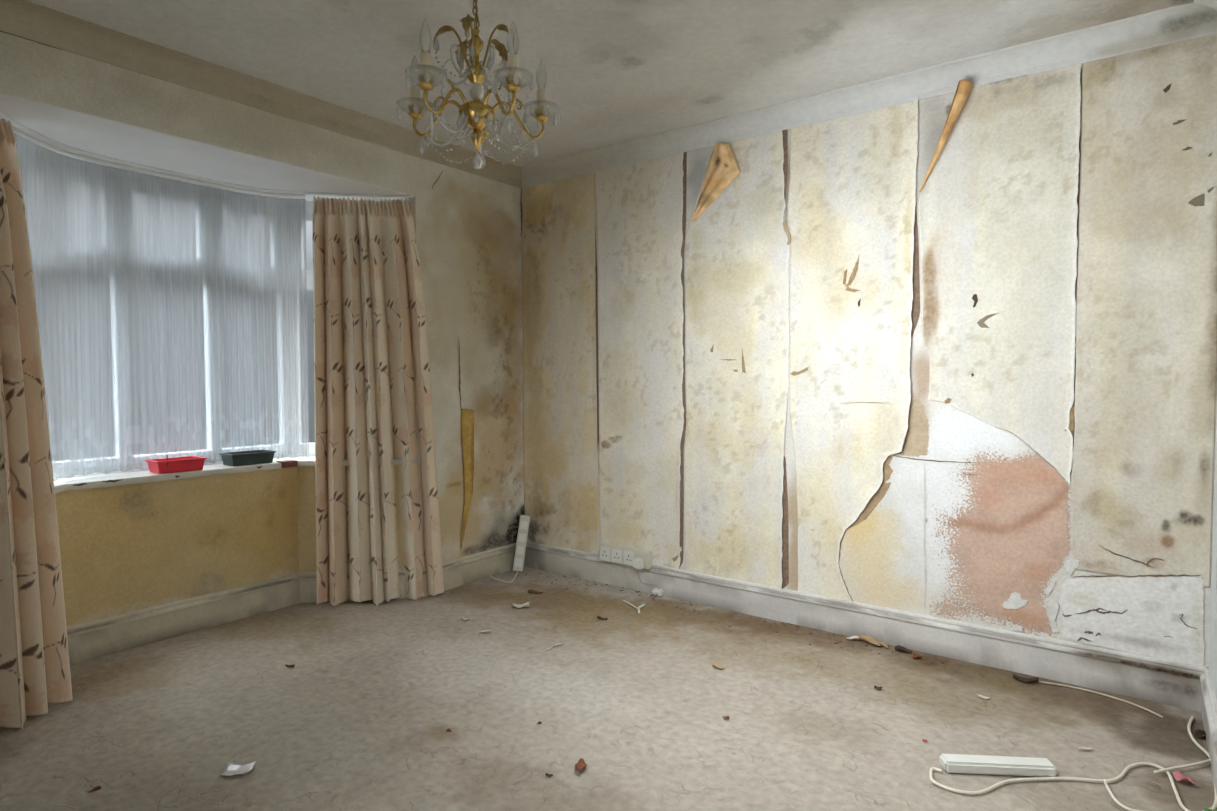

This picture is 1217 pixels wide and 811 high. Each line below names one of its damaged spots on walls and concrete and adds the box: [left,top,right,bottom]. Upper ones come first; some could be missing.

peeling [692,143,740,222]
peeling [919,79,973,192]
peeling [461,409,474,549]
water stain [481,505,536,551]
flaking render [926,444,1080,638]